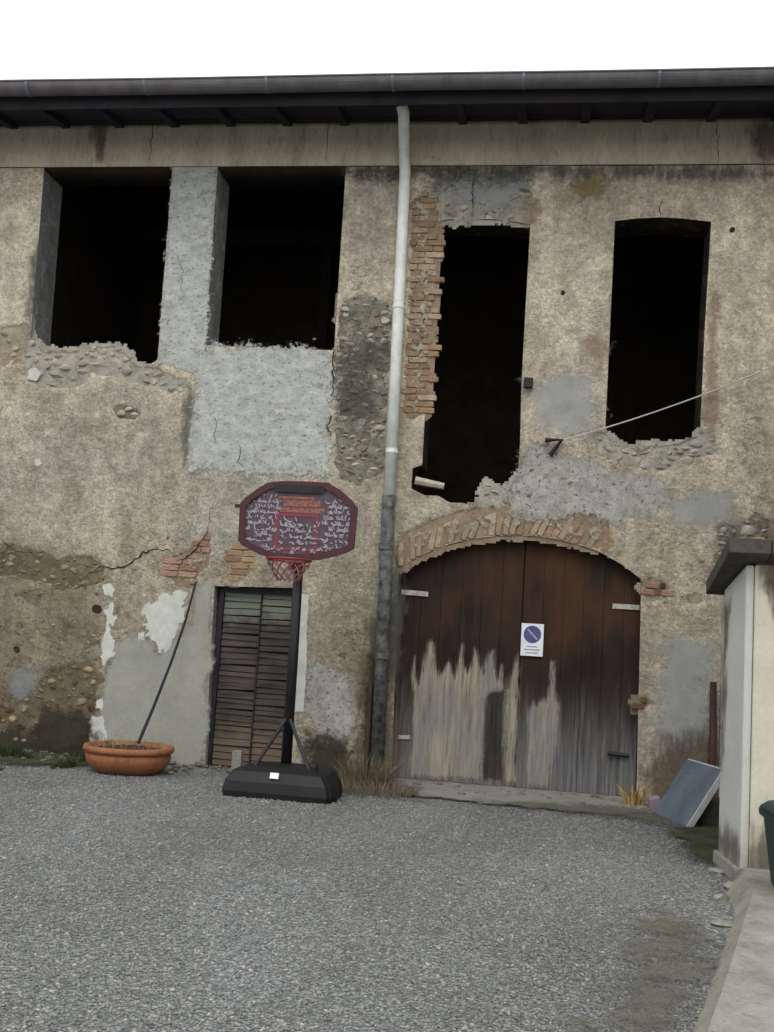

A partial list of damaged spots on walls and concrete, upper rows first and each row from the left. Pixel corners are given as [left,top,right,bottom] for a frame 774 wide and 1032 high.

water stain [357,165,504,177]
water stain [615,166,741,179]
flaking render [0,314,187,394]
flaking render [332,170,536,485]
flaking render [593,427,719,472]
flaking render [393,444,635,575]
crack [94,515,210,571]
peeling [138,535,212,653]
flaking render [221,544,258,588]
flaking render [714,515,774,563]
flaking render [0,546,117,750]